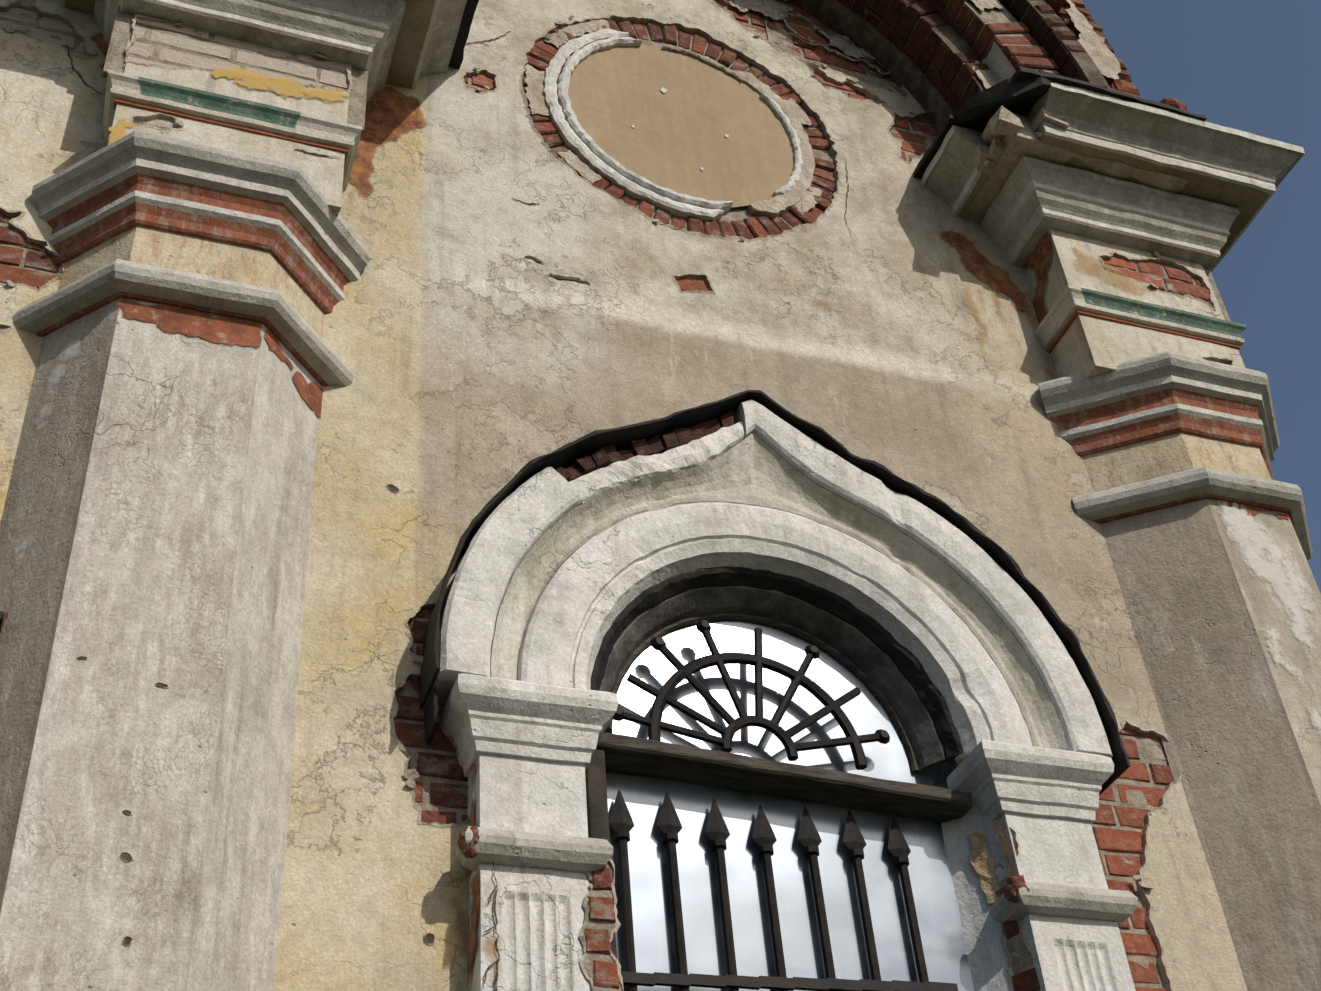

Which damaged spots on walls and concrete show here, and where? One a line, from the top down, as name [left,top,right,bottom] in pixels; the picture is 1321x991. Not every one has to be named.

crack [66,44,102,95]
spalling [108,107,184,137]
spalling [0,0,368,130]
spalling [461,67,499,94]
spalling [518,14,841,242]
spalling [713,0,938,164]
spalling [0,206,65,293]
spalling [389,600,470,828]
crack [483,862,500,991]
spalling [967,821,1019,904]
spalling [1001,919,1041,991]
spalling [1091,719,1181,991]